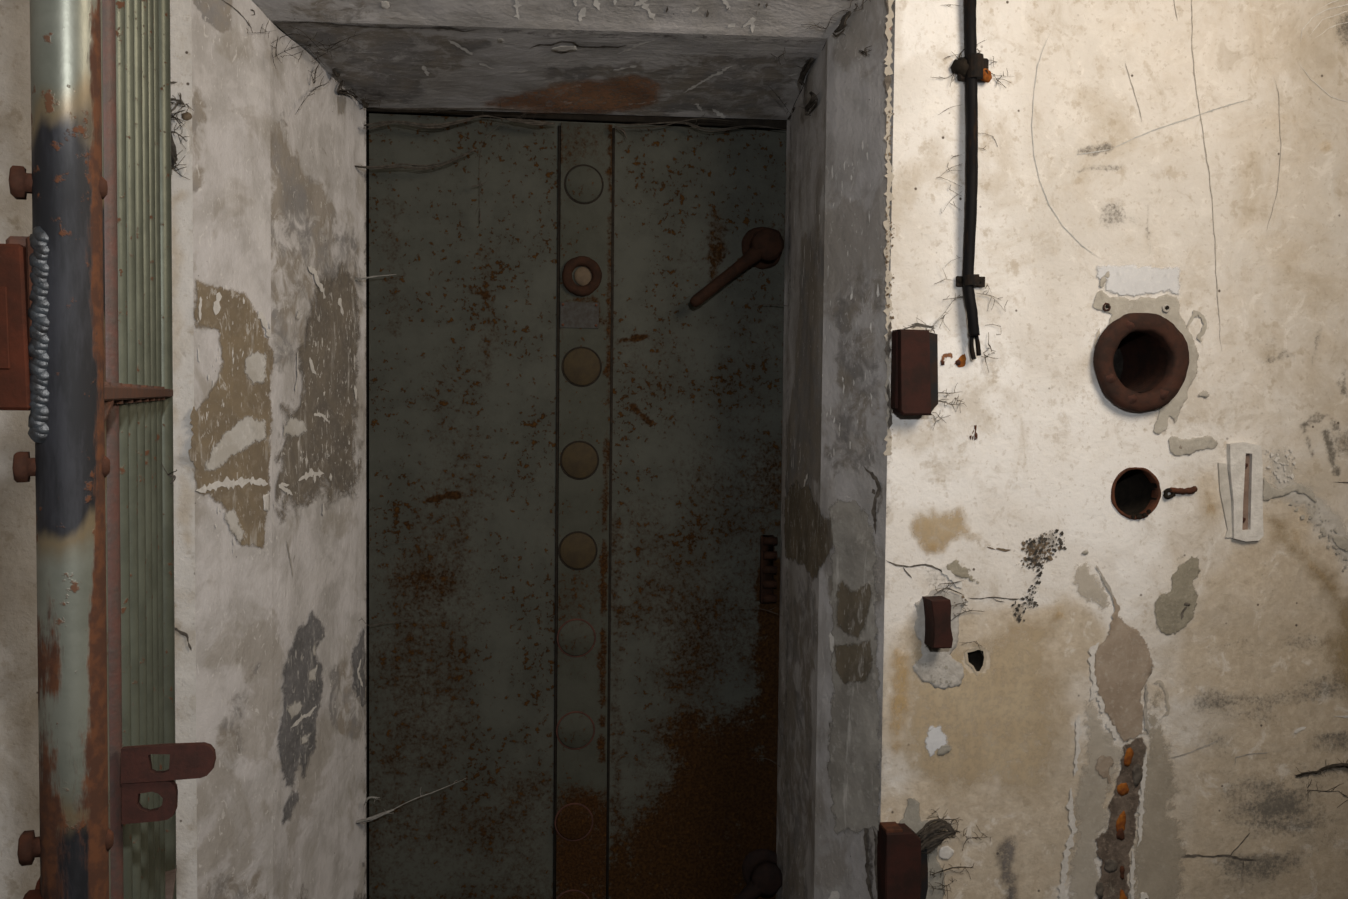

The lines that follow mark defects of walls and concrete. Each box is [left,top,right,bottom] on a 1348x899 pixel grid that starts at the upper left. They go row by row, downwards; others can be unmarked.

spalling [883,0,895,456]
peeling [188,262,362,548]
peeling [278,611,325,823]
peeling [784,467,882,899]
spalling [900,798,954,899]
peeling [925,726,952,757]
water stain [893,529,1067,786]
rust [1095,737,1147,899]
spalling [1057,550,1187,899]
spalling [1155,556,1200,635]